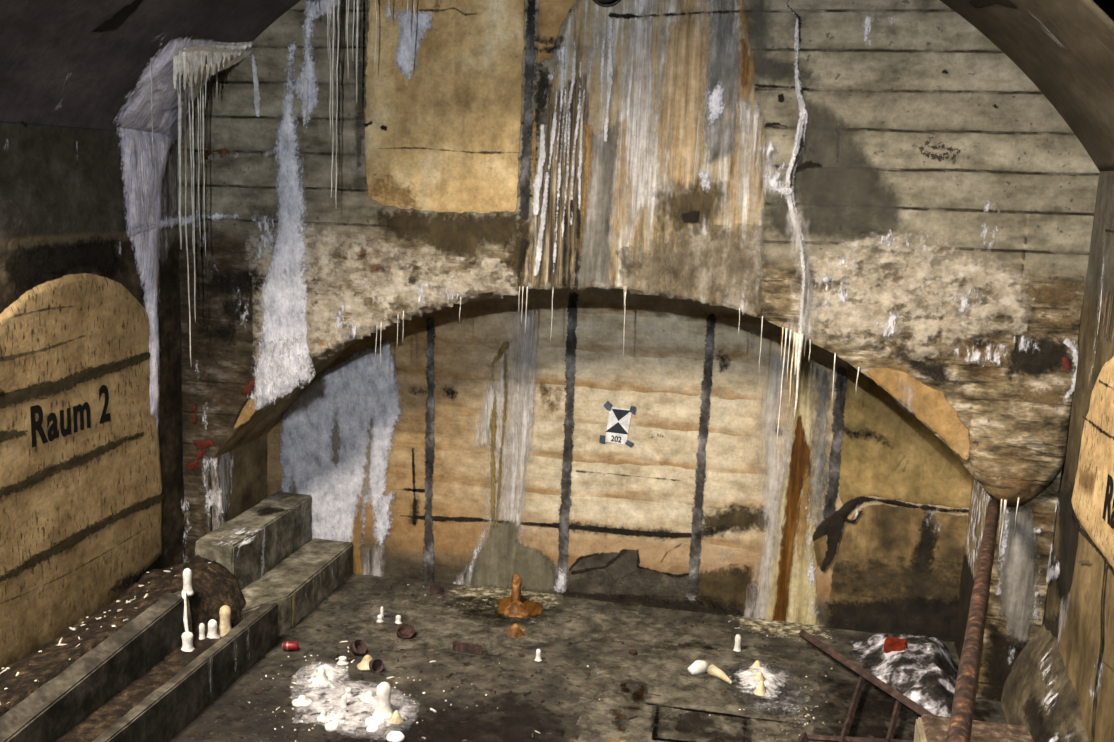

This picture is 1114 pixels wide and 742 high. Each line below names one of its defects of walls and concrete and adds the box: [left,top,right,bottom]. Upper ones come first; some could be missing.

water stain [93,0,143,32]
efflorescence [178,212,238,244]
efflorescence [242,0,518,576]
water stain [582,125,592,222]
water stain [612,0,815,240]
crack [754,5,821,337]
water stain [765,104,1036,366]
efflorescence [203,452,234,529]
rust [773,416,811,623]
crack [813,496,969,571]